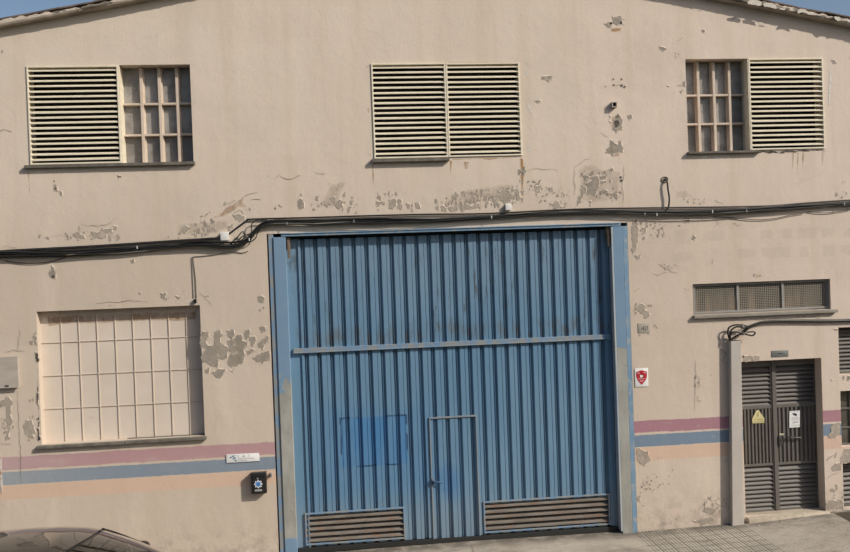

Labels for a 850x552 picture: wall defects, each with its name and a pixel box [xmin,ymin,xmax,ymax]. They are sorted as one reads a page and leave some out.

flaking render [602,114,633,156]
peeling [297,183,358,214]
peeling [376,191,421,212]
peeling [435,159,624,212]
peeling [199,326,271,379]
peeling [0,396,37,441]
peeling [825,448,850,511]